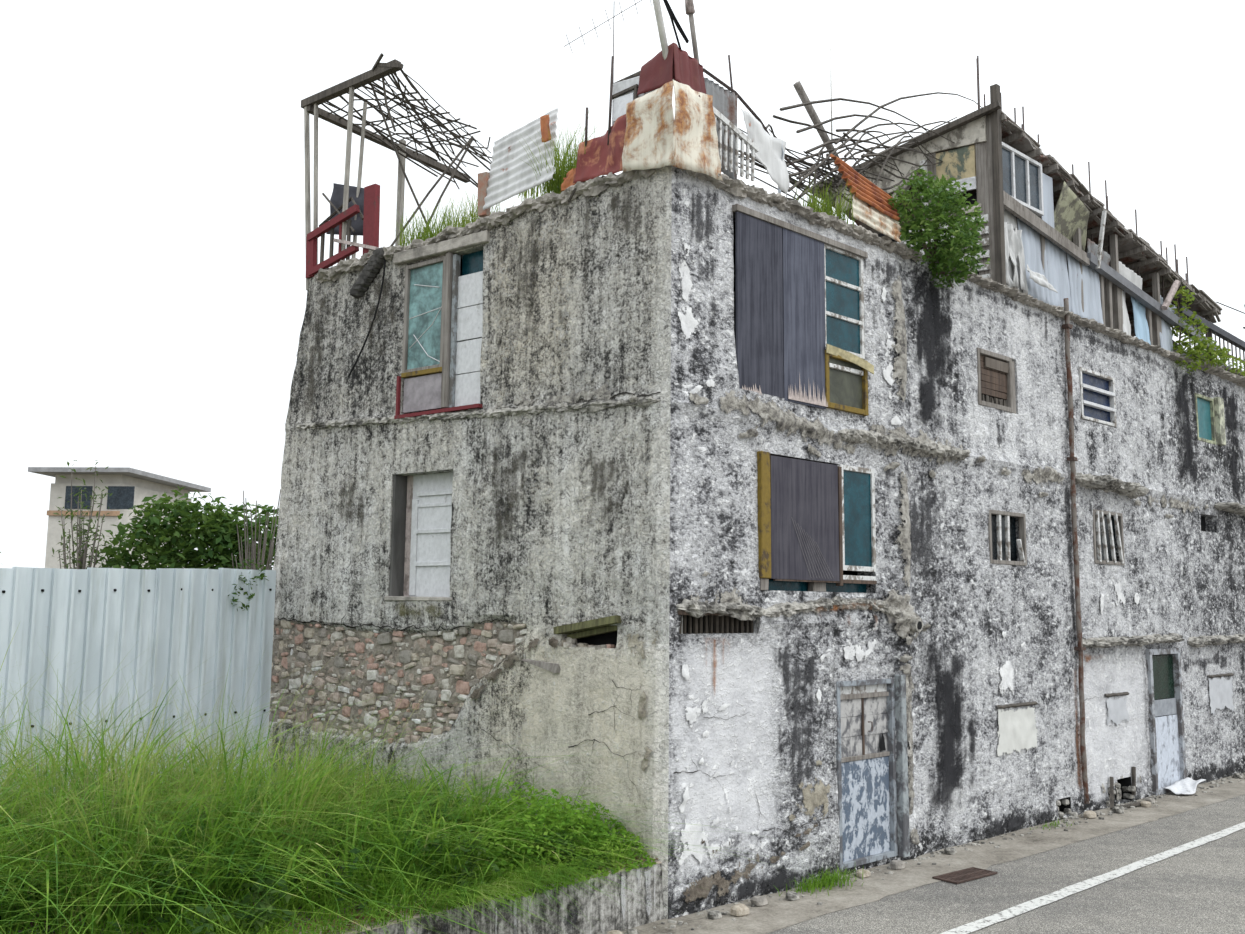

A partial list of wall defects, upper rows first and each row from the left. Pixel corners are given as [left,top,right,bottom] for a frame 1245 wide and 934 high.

leakage [863,258,1054,424]
spalling [269,616,561,747]
peeling [681,696,730,737]
leakage [928,645,975,808]
peeling [674,757,831,903]